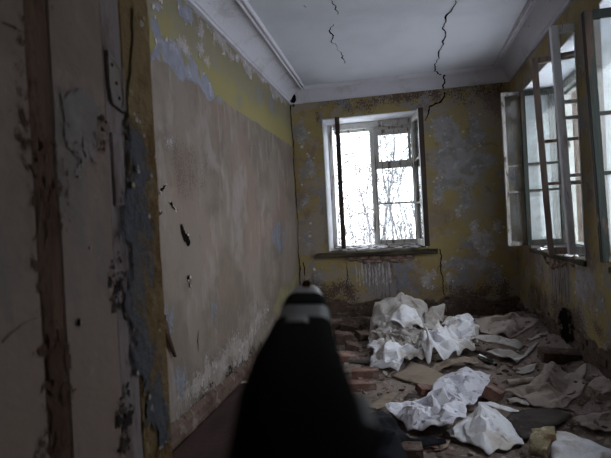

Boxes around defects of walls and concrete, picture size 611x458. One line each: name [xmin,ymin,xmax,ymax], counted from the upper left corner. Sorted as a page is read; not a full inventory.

peeling [128,0,222,128]
crack [329,0,345,62]
crack [425,0,457,121]
peeling [428,109,501,219]
spalling [180,224,190,247]
peeling [108,251,124,313]
peeling [176,260,298,418]
leakage [300,261,400,303]
flaking render [327,298,383,319]
crack [437,249,446,300]
flaking render [423,294,611,381]
peeling [115,381,134,455]